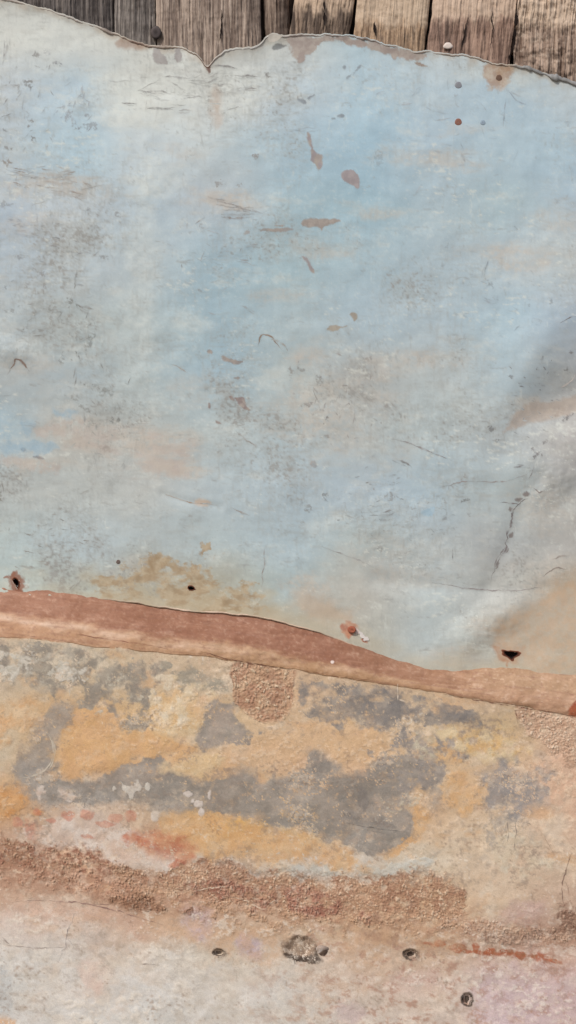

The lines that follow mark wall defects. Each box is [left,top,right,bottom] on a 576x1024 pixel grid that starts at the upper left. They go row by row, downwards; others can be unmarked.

rust [481,63,516,92]
peeling [306,132,324,171]
peeling [340,169,361,189]
crack [432,467,568,592]
rust [3,569,29,592]
peeling [0,639,576,964]
rust [464,945,536,961]